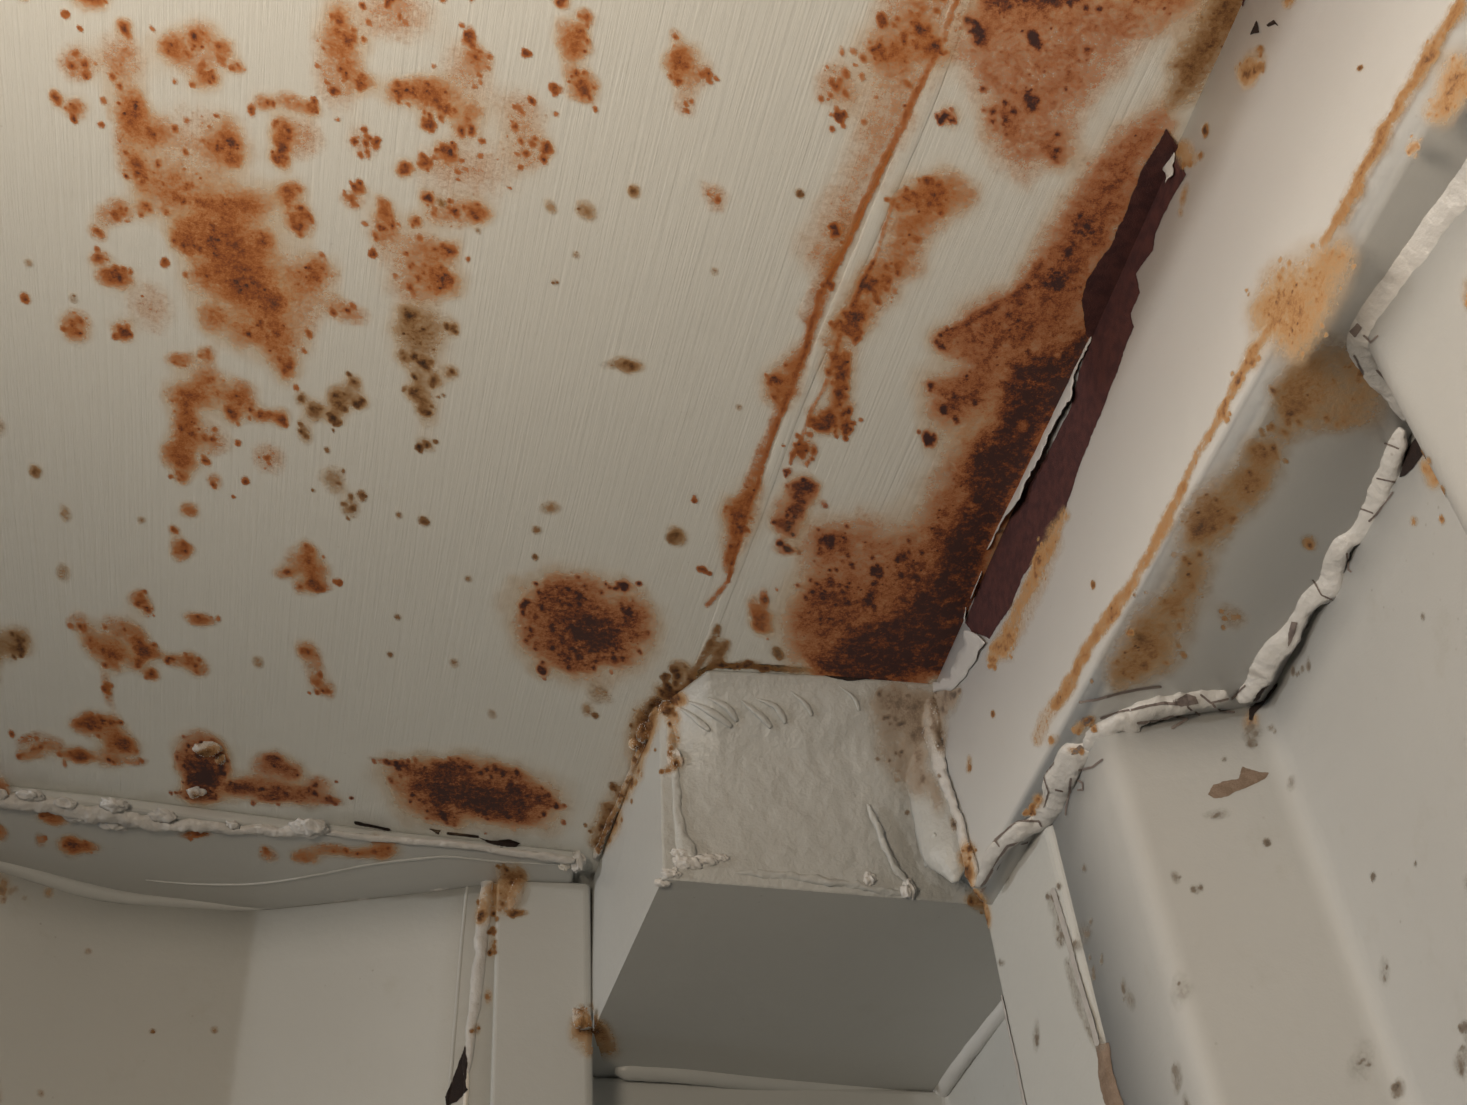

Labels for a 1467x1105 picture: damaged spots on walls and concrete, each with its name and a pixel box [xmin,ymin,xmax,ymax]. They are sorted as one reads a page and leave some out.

corrosion [49,0,598,521]
corrosion [584,0,1243,854]
peeling [932,129,1186,693]
corrosion [1034,0,1467,755]
crack [1349,323,1384,379]
crack [1360,430,1422,522]
corrosion [513,571,656,719]
crack [1288,622,1297,646]
crack [1312,553,1352,600]
corrosion [372,755,567,834]
crack [980,684,1277,894]
peeling [1096,1042,1124,1105]